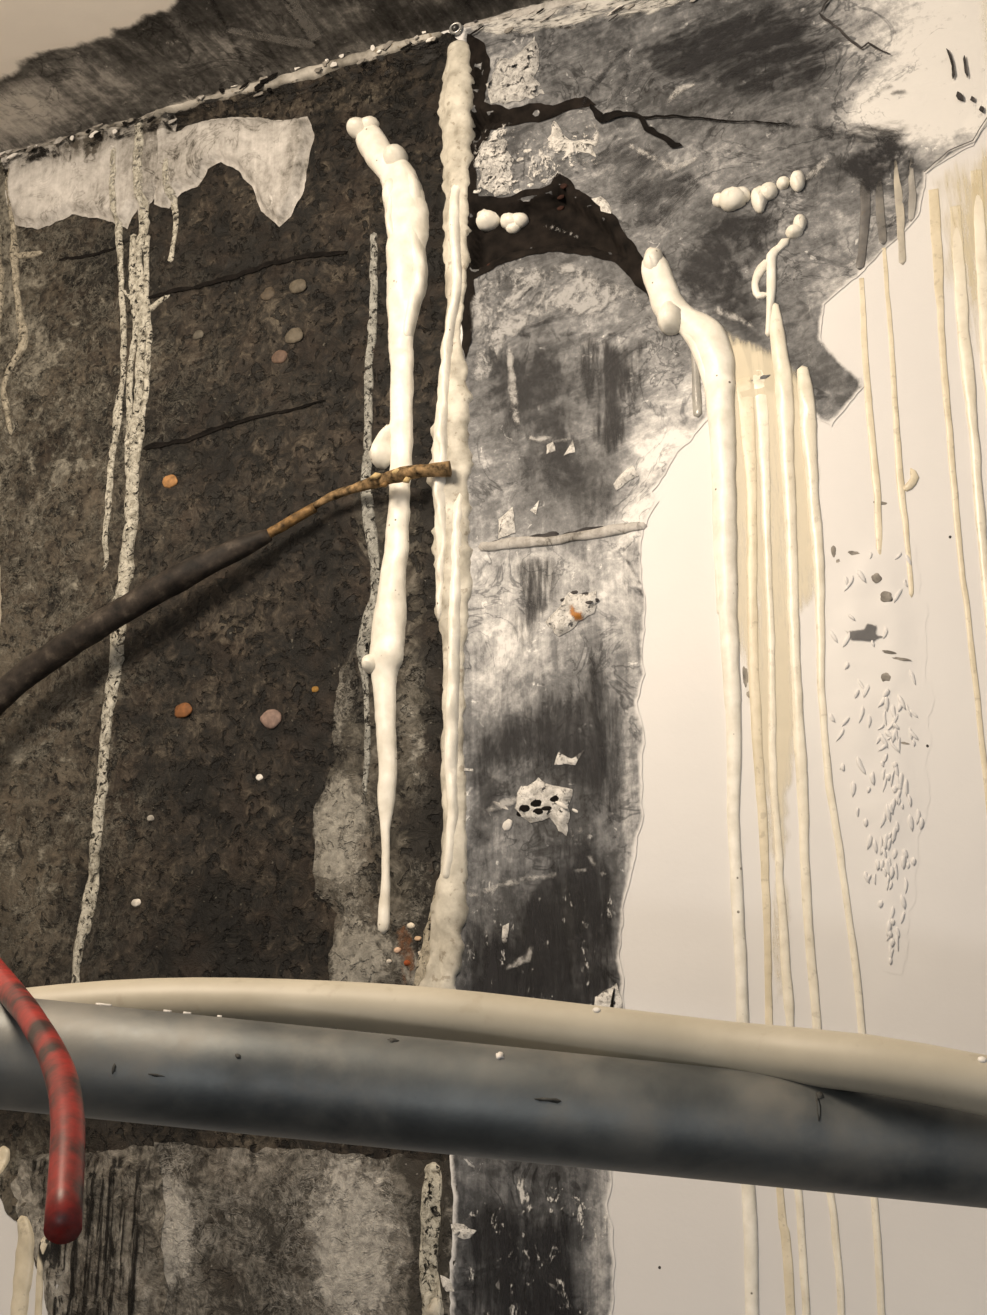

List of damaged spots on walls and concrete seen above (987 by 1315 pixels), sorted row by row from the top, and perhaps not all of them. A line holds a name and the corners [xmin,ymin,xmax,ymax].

efflorescence [0,169,43,435]
efflorescence [356,232,380,794]
spalling [0,0,987,1013]
water stain [729,338,813,849]
water stain [958,158,987,291]
spalling [0,1109,615,1315]